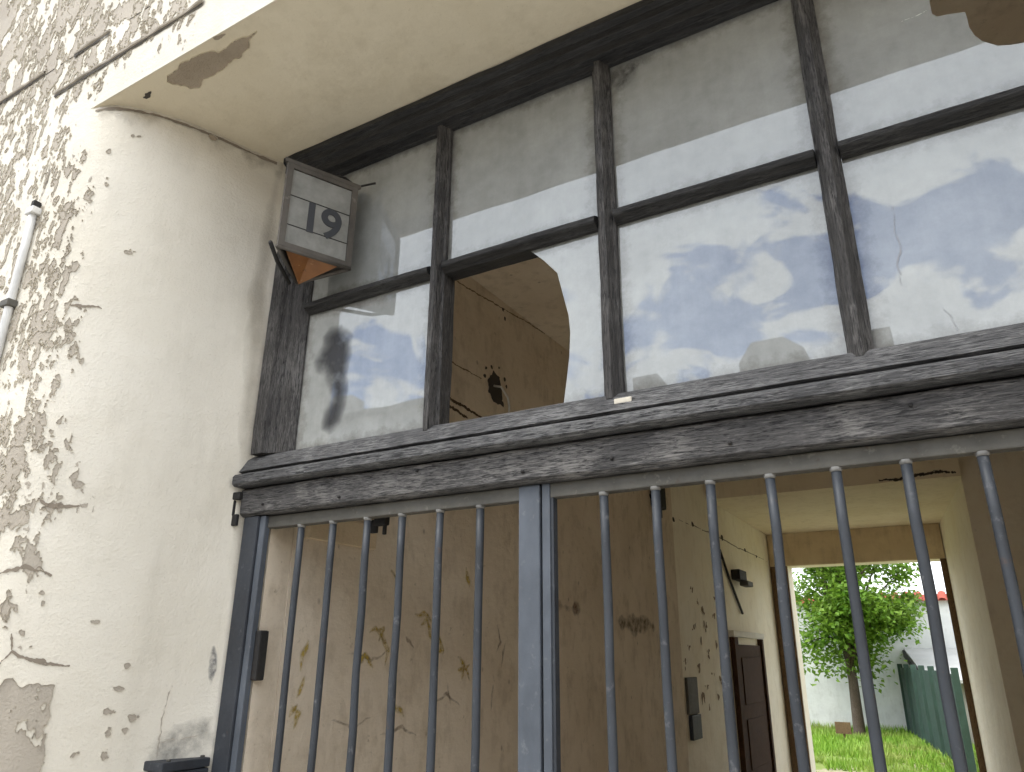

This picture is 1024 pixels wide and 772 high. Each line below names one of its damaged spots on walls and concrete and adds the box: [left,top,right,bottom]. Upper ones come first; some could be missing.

peeling [0,0,257,606]
crack [879,470,956,481]
crack [0,633,70,667]
flaking render [0,678,55,772]